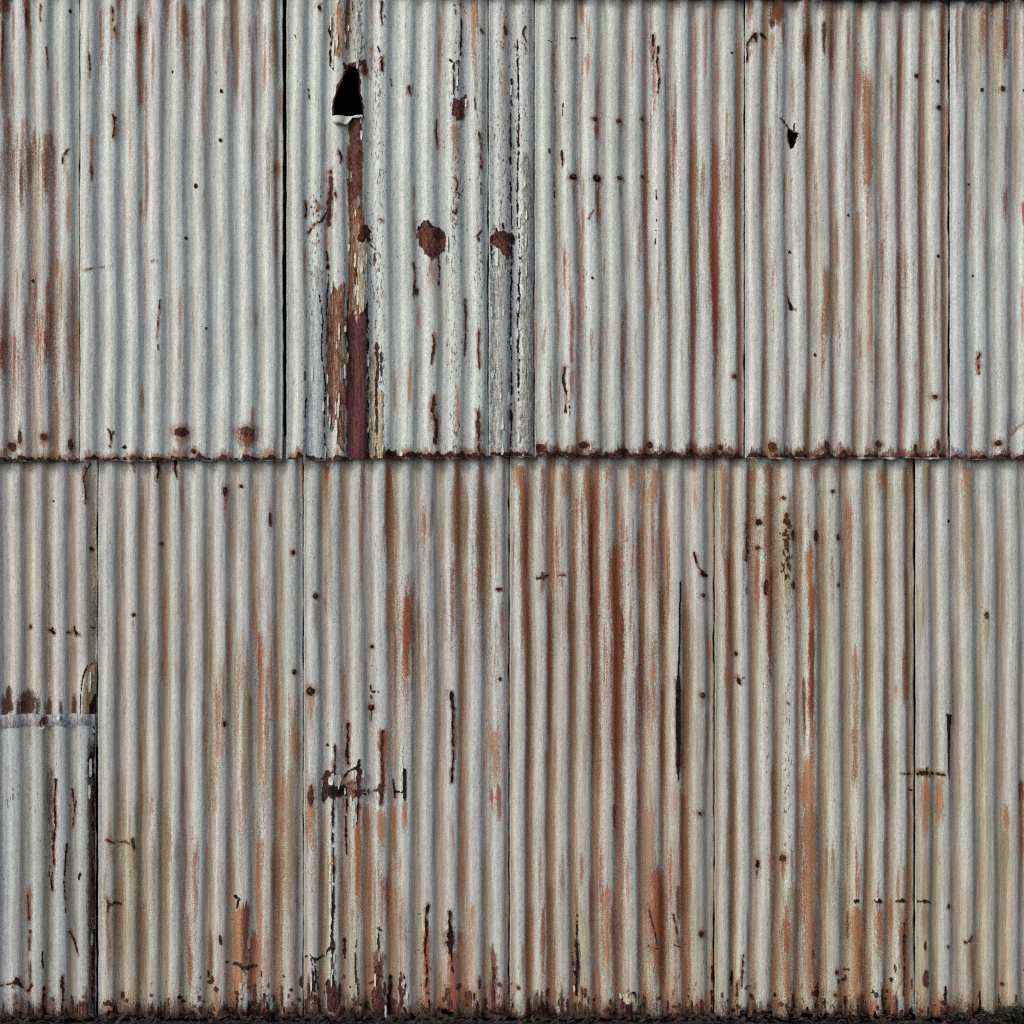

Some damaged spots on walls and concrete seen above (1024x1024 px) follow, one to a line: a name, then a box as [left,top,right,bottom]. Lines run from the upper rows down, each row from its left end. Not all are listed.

rust [0,0,55,211]
rust [0,271,79,394]
peeling [303,0,384,465]
rust [592,173,603,224]
rust [638,48,741,376]
rust [0,423,1024,1019]